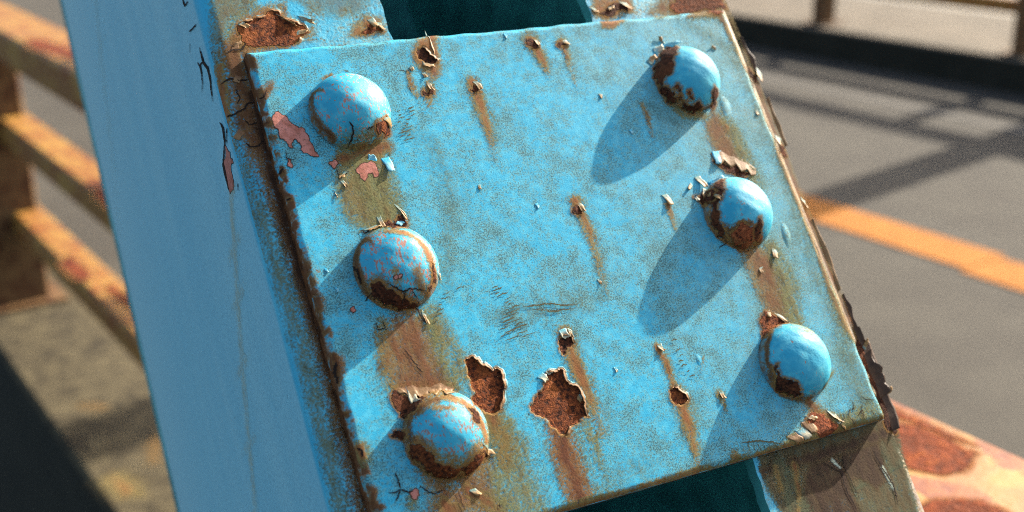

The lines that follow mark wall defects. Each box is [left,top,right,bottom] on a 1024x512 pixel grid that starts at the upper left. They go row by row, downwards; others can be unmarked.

crack [182,0,263,193]
peeling [272,111,395,198]
rust [214,1,386,512]
rust [309,0,979,512]
rust [921,497,1009,512]